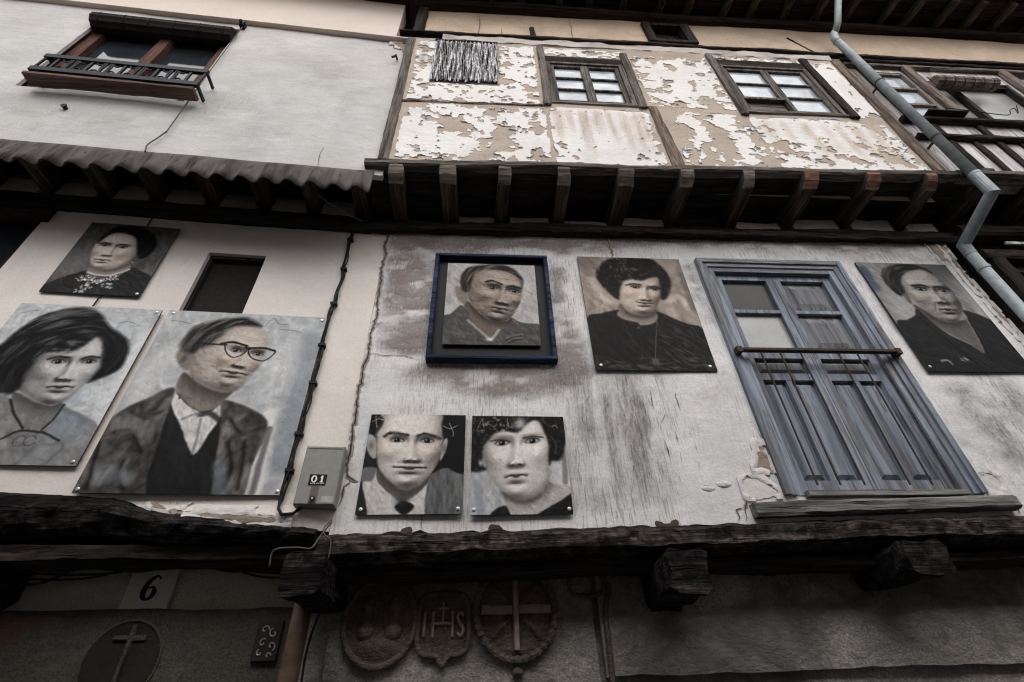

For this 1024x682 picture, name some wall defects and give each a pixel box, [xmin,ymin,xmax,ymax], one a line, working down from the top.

peeling [389,40,928,170]
crack [339,234,419,505]
spalling [736,438,783,502]